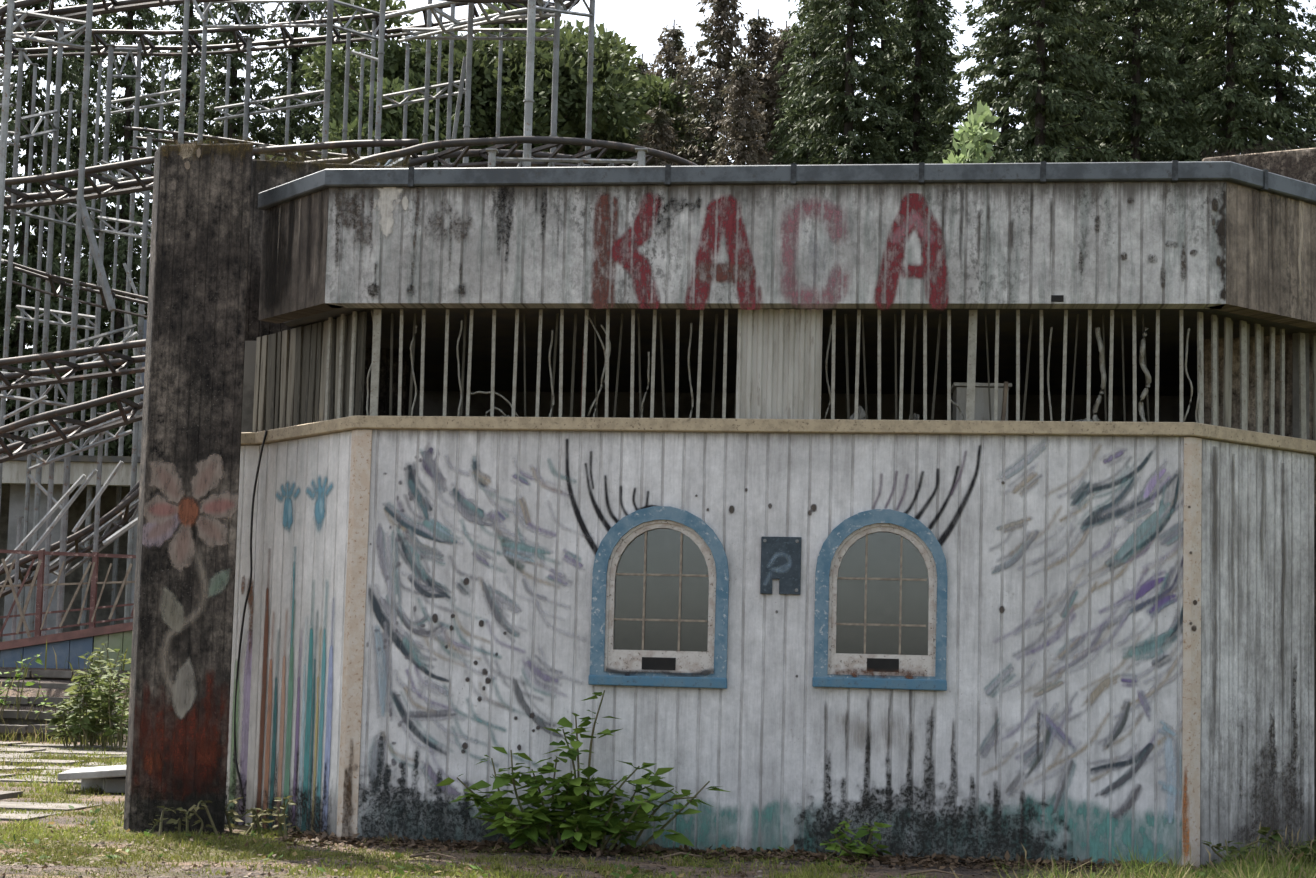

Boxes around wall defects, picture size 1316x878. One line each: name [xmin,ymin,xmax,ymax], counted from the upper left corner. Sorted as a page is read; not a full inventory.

leakage [494,187,514,261]
leakage [535,188,559,238]
leakage [1254,188,1304,283]
leakage [1212,448,1235,703]
leakage [1234,464,1316,854]